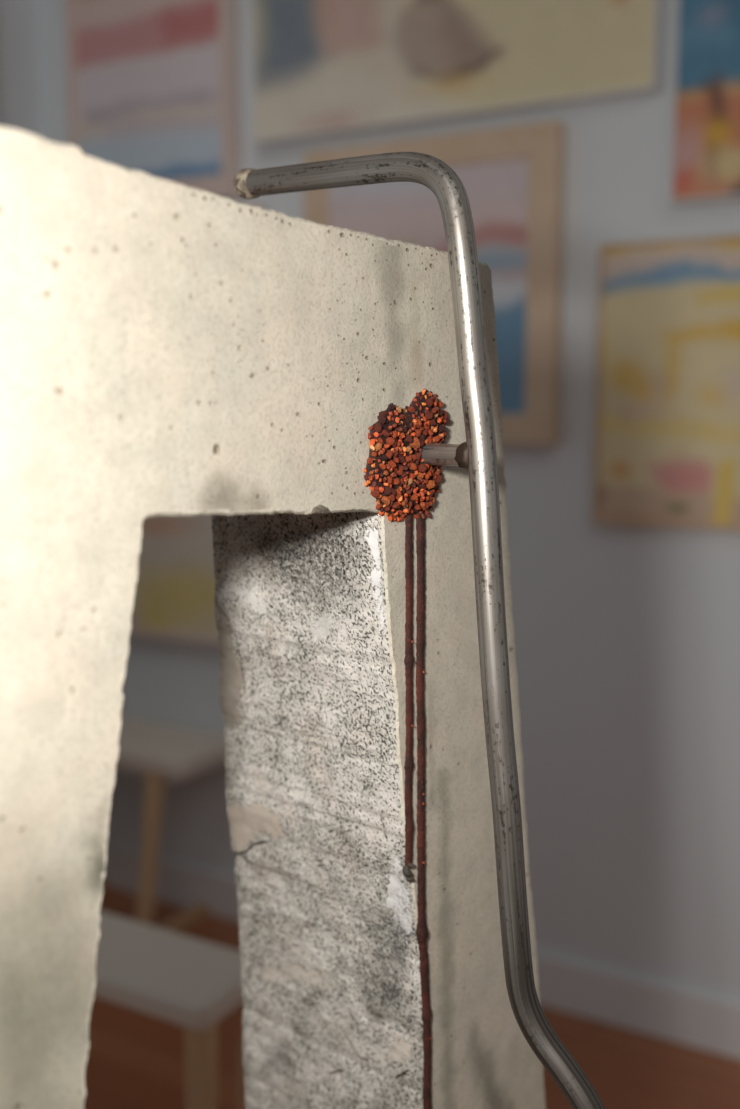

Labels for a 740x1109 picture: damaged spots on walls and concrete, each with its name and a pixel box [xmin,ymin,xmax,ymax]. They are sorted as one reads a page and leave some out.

spalling [311,504,374,514]
spalling [216,600,247,736]
corrosion [364,389,451,1109]
spalling [227,799,285,853]